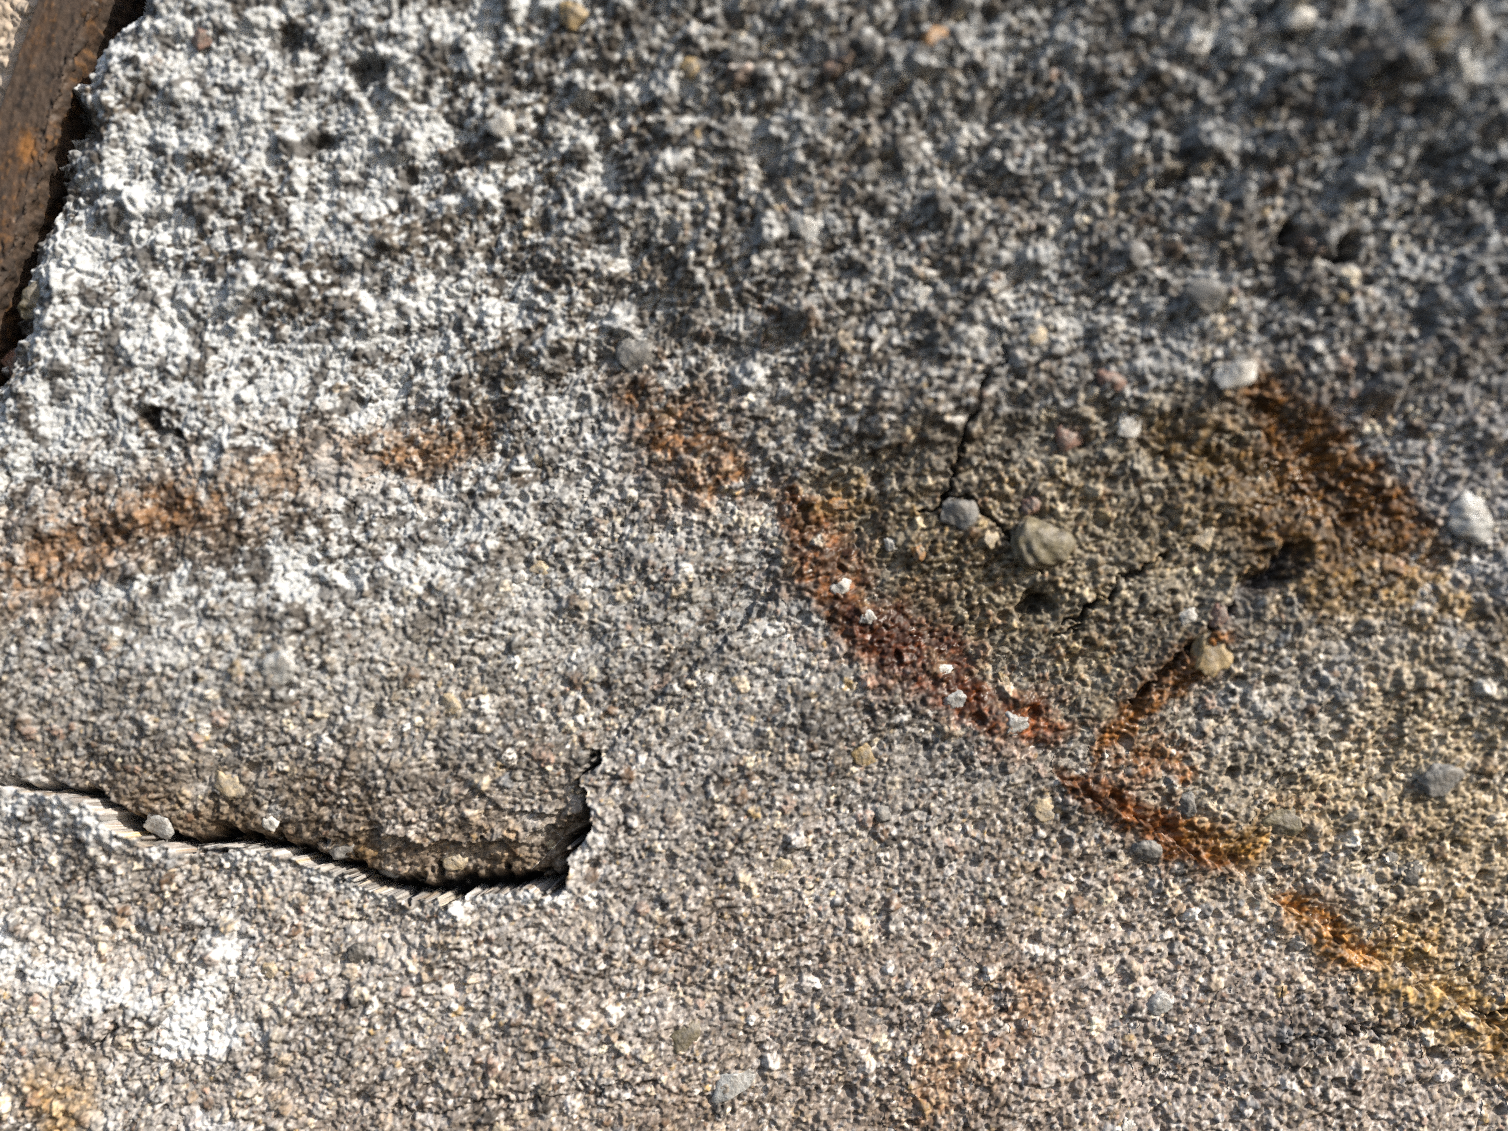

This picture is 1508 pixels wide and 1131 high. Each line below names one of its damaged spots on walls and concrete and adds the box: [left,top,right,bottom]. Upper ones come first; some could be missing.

crack [944,321,1010,494]
rust [596,347,1508,1131]
crack [6,749,612,924]
rust [0,1043,107,1131]